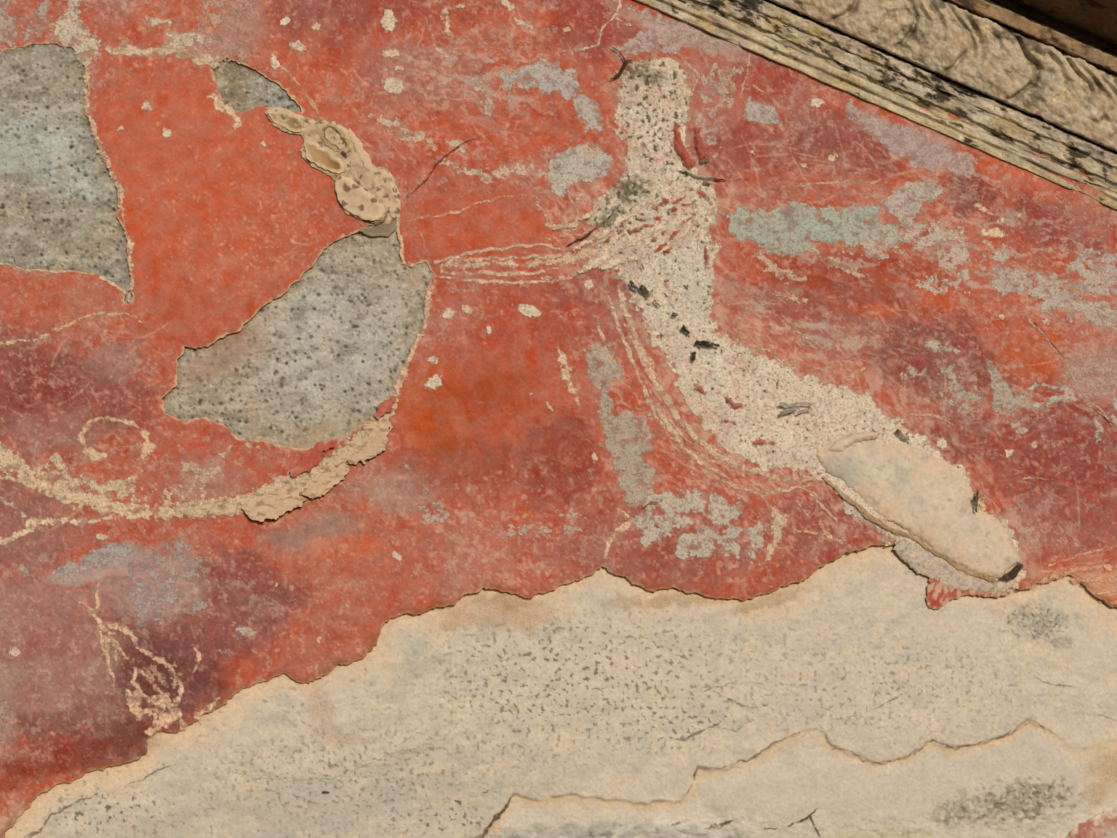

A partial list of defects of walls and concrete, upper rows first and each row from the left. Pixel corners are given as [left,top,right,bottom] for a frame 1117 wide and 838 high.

peeling [365,113,467,153]
peeling [693,63,748,148]
peeling [745,96,779,124]
flaking render [0,0,436,523]
peeling [721,181,974,295]
peeling [425,356,442,390]
flaking render [608,285,740,479]
peeling [582,342,743,563]
peeling [416,496,450,524]
peeling [494,507,587,539]
peeling [54,533,208,627]
peeling [126,661,183,718]